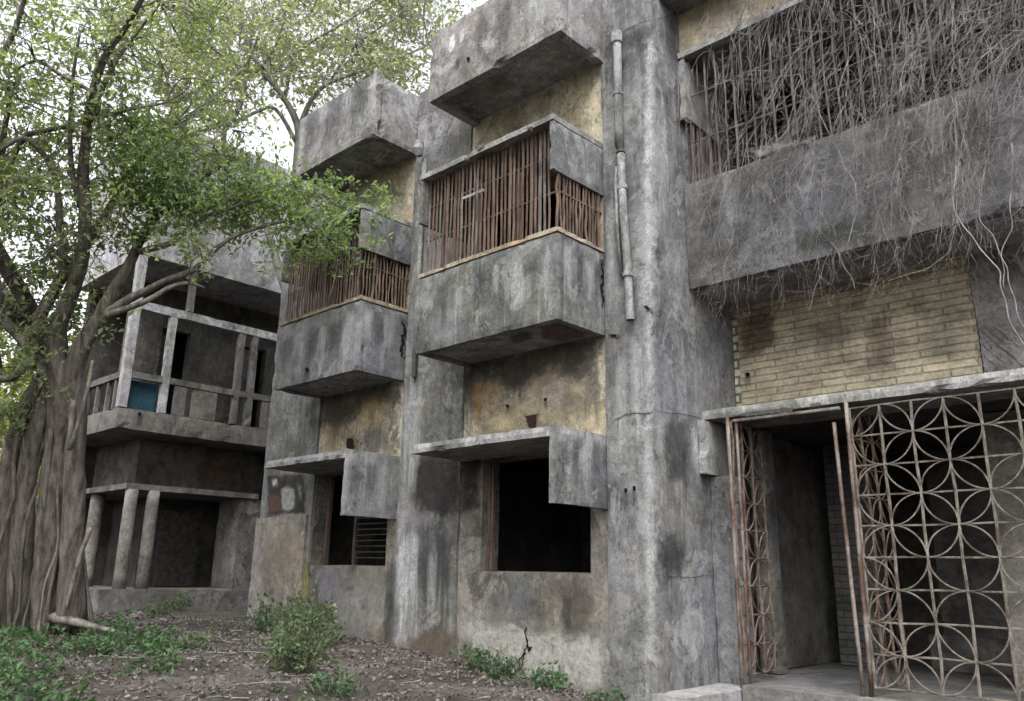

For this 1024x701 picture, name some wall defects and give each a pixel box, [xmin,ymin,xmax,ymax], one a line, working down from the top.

leakage [414,457,481,515]
leakage [385,562,397,633]